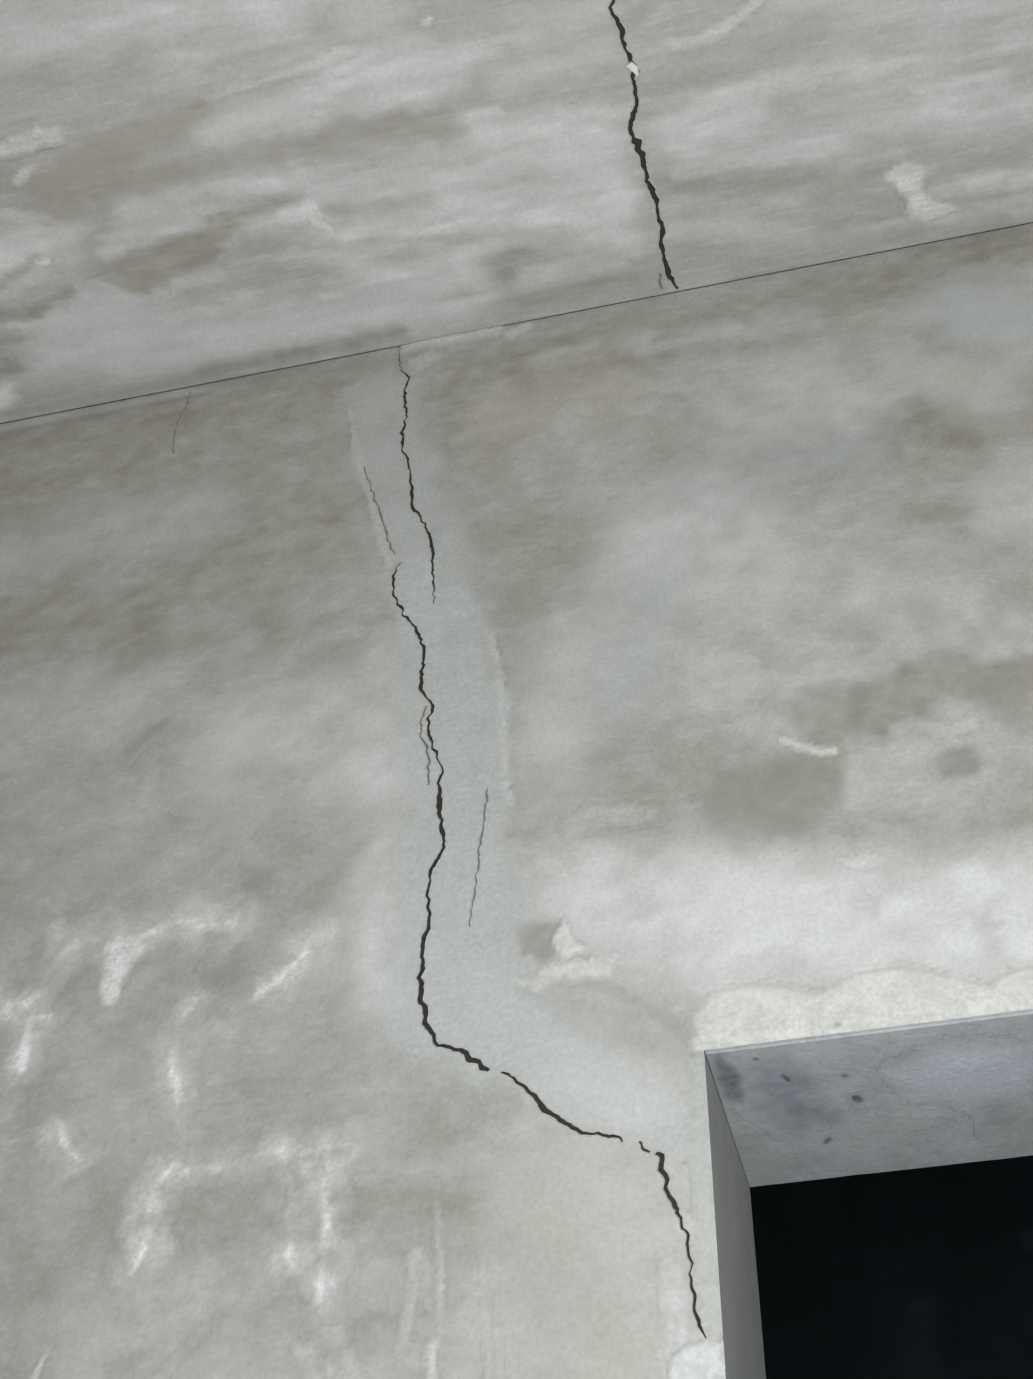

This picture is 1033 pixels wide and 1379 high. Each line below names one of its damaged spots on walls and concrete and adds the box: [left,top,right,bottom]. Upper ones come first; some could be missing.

crack [472,0,1033,332]
crack [0,344,707,1339]
leakage [0,856,373,1379]
leakage [387,1197,450,1379]